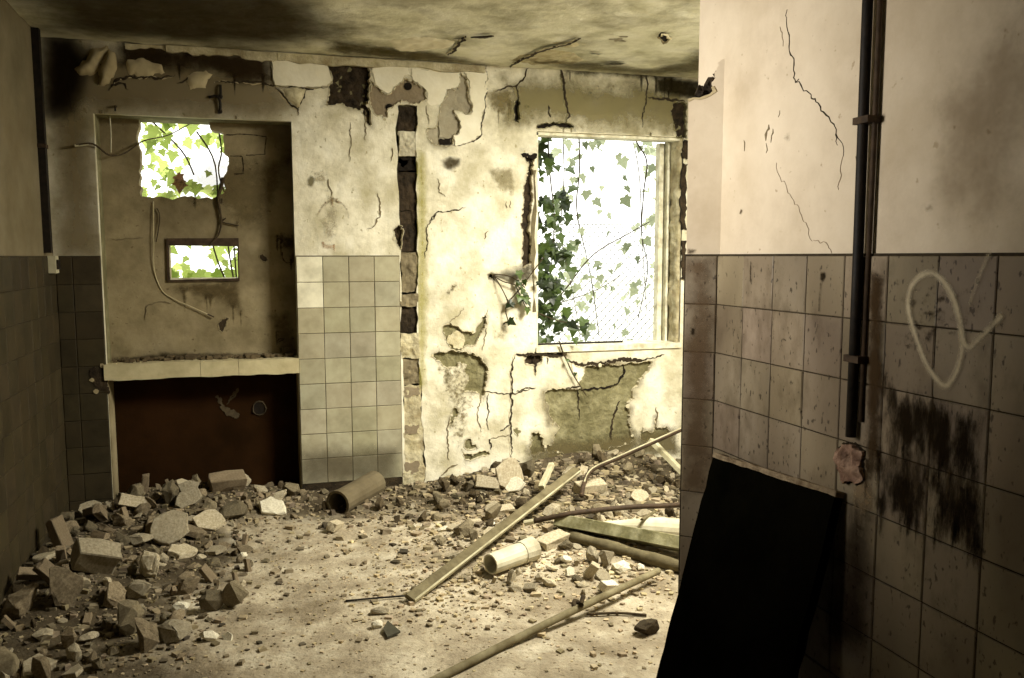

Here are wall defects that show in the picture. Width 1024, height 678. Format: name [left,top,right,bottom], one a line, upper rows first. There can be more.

crack [446,35,494,56]
crack [457,38,581,146]
crack [780,9,856,190]
crack [424,181,463,254]
crack [776,163,832,253]
flaking render [271,64,490,485]
flaking render [513,352,670,456]
spalling [833,442,866,486]
leakage [865,275,980,562]